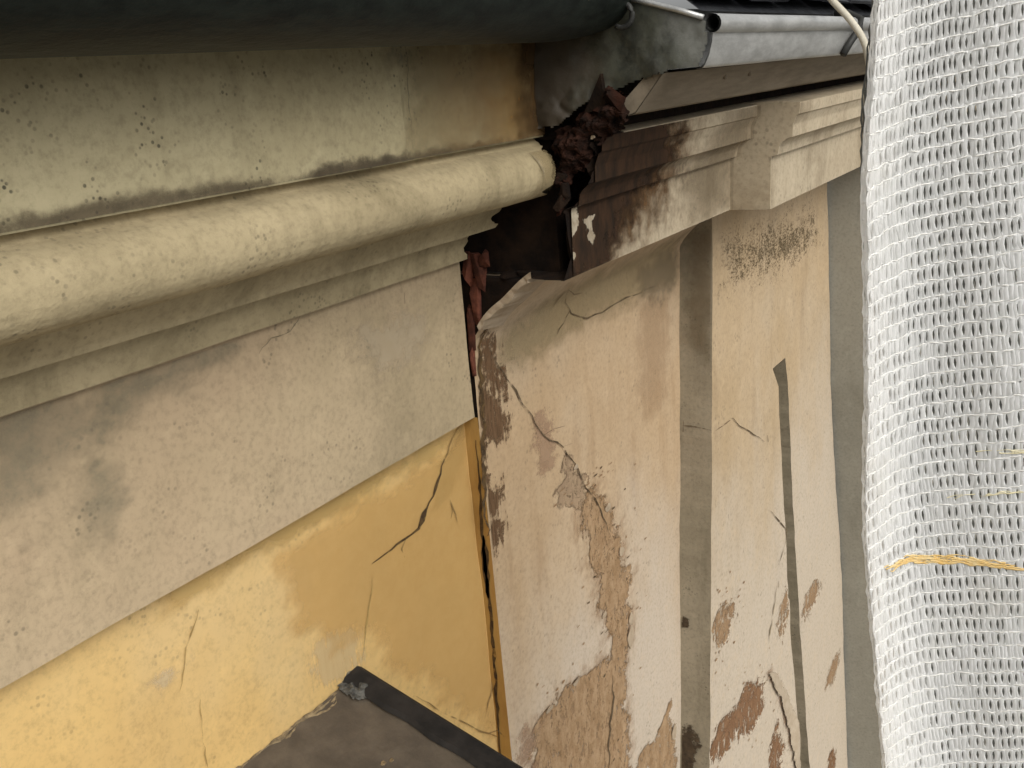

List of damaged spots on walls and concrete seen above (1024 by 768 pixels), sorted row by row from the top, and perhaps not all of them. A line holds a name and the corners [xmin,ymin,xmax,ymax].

spalling [551,73,630,244]
damp [571,120,690,277]
spalling [462,249,545,376]
crack [554,286,658,334]
damp [691,202,825,343]
crack [683,418,769,442]
crack [364,329,611,754]
crack [180,610,202,717]
peeling [528,453,678,768]
peeling [712,581,745,674]
peeling [710,664,786,768]
peeling [776,579,821,645]